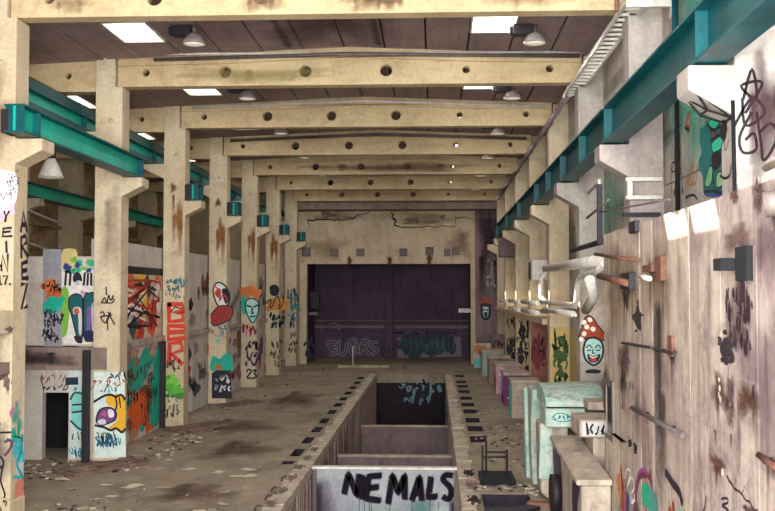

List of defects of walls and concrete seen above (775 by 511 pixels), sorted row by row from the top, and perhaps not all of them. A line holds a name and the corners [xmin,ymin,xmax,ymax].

rust [171,184,182,231]
crack [307,211,370,226]
crack [389,213,472,228]
rust [217,221,225,247]
crack [726,475,758,511]